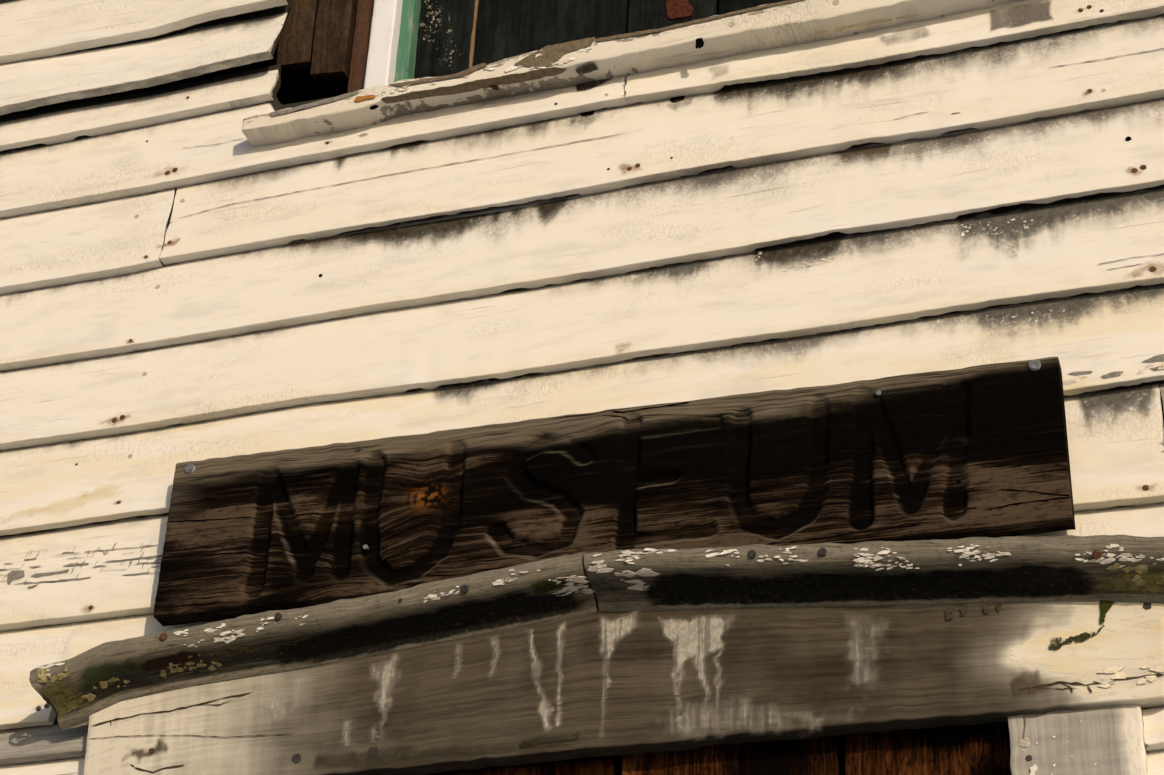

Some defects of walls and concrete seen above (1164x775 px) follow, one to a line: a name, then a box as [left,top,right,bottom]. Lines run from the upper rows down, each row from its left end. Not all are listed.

peeling [374,0,800,104]
leakage [714,60,914,100]
peeling [269,91,359,116]
leakage [285,207,521,246]
leakage [537,198,568,219]
leakage [755,226,920,263]
leakage [960,188,1164,242]
leakage [974,285,1164,325]
peeling [1075,544,1164,586]
leakage [279,578,579,709]
leakage [602,617,635,658]
peeling [1093,665,1164,688]